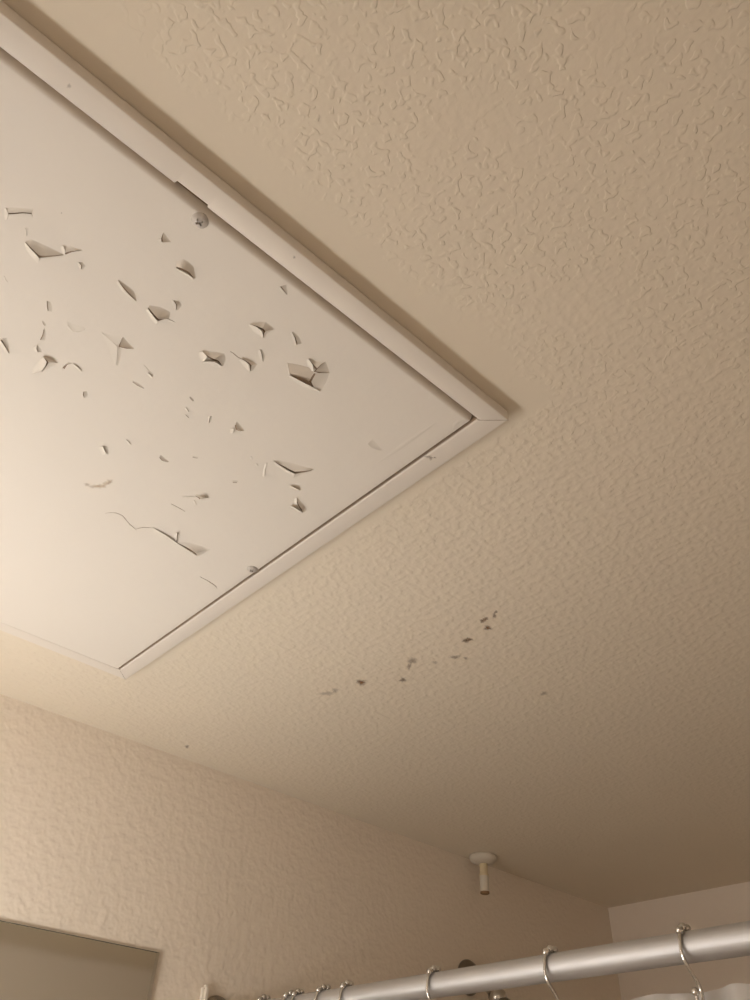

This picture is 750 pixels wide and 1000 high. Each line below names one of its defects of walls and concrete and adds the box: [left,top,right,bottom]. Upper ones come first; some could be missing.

peeling [4,207,86,270]
peeling [176,259,195,280]
peeling [116,280,137,301]
peeling [145,300,182,324]
peeling [32,301,81,374]
peeling [101,332,134,365]
peeling [249,322,275,338]
peeling [199,350,265,372]
peeling [286,358,330,392]
peeling [250,457,313,478]
peeling [153,528,210,556]